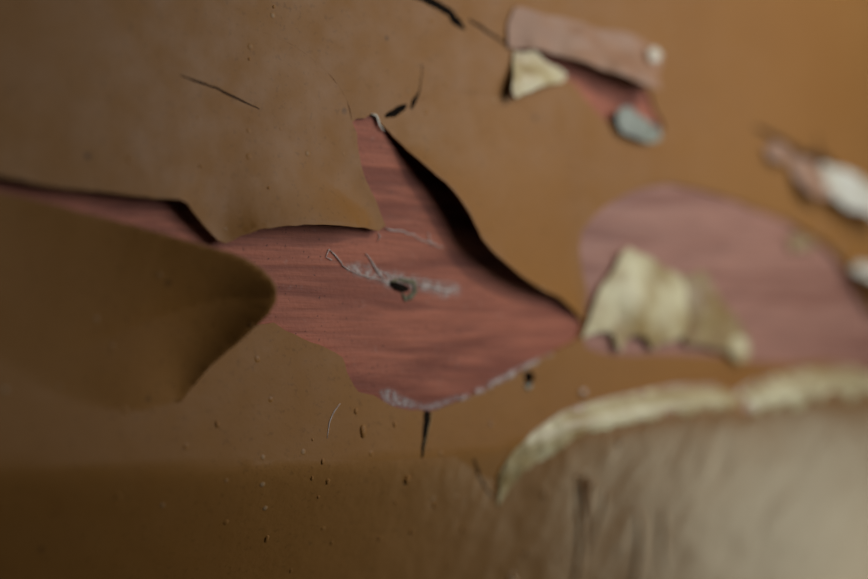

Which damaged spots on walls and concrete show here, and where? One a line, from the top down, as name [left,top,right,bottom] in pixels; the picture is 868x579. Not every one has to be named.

peeling [0,5,868,459]
crack [420,0,508,47]